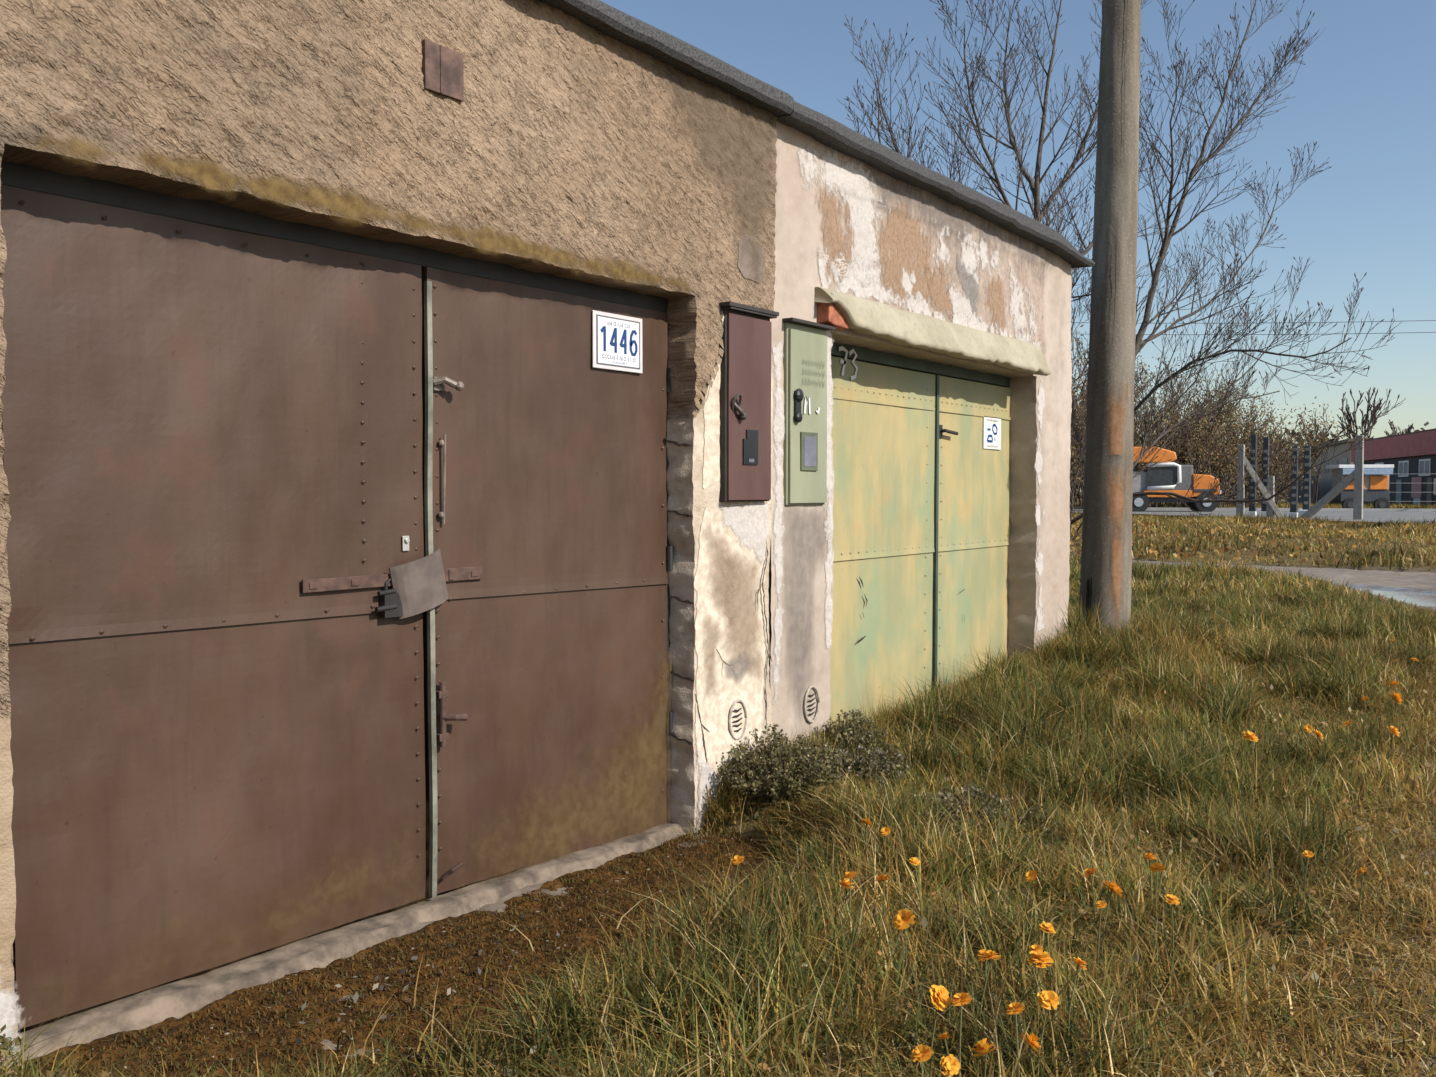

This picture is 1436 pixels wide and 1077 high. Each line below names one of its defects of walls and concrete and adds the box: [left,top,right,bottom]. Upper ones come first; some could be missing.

peeling [798,143,1043,648]